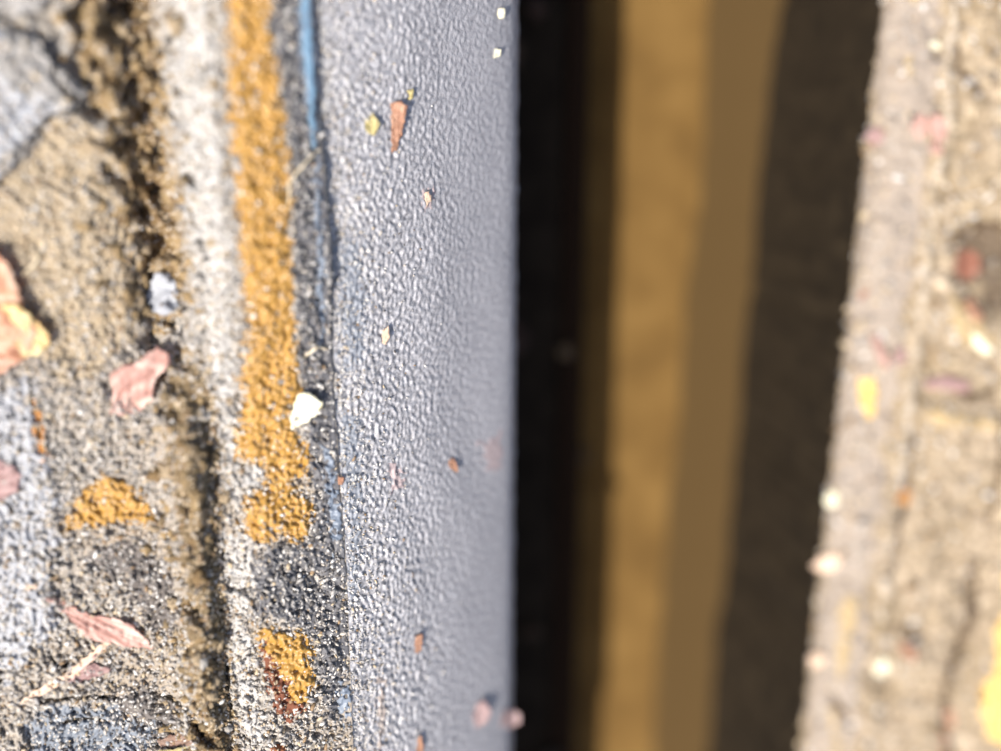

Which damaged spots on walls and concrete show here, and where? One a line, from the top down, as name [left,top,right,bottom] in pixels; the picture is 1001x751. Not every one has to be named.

crack [0,26,86,164]